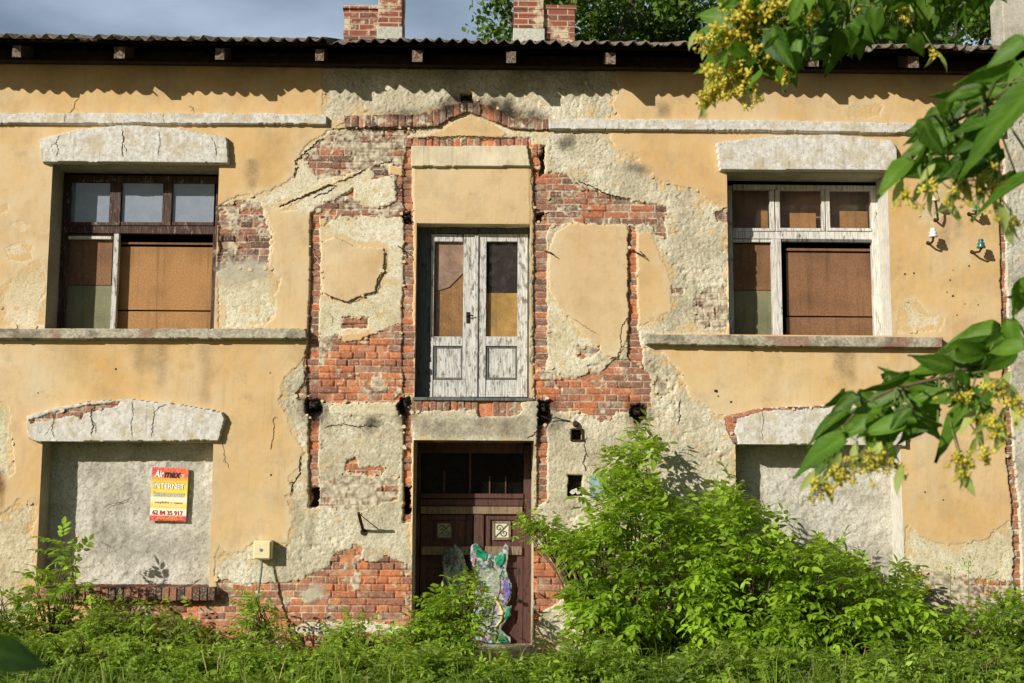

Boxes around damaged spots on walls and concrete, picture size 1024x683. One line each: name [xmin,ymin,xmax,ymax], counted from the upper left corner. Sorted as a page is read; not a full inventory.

crack [279,118,515,207]
flaking render [999,225,1008,322]
flaking render [59,68,829,651]
flaking render [0,402,15,478]
flaking render [0,499,38,635]
flaking render [902,395,1021,652]